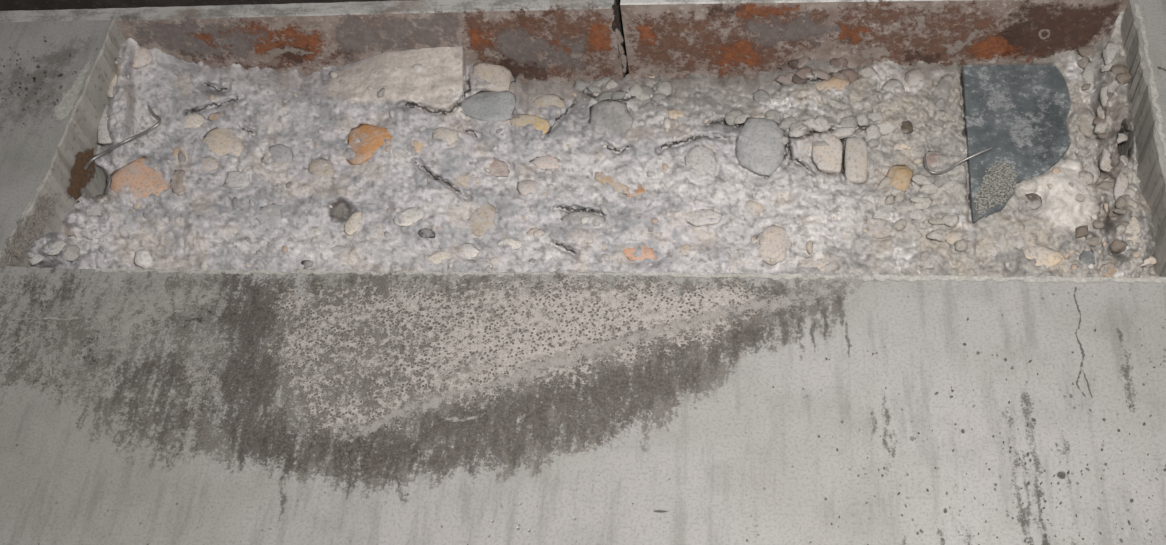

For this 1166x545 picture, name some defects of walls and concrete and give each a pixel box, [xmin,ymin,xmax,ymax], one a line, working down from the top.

rust [182,20,351,70]
crack [585,4,636,101]
rust [462,0,1119,82]
spalling [26,4,1166,283]
damp [0,267,850,515]
crack [1074,287,1092,396]